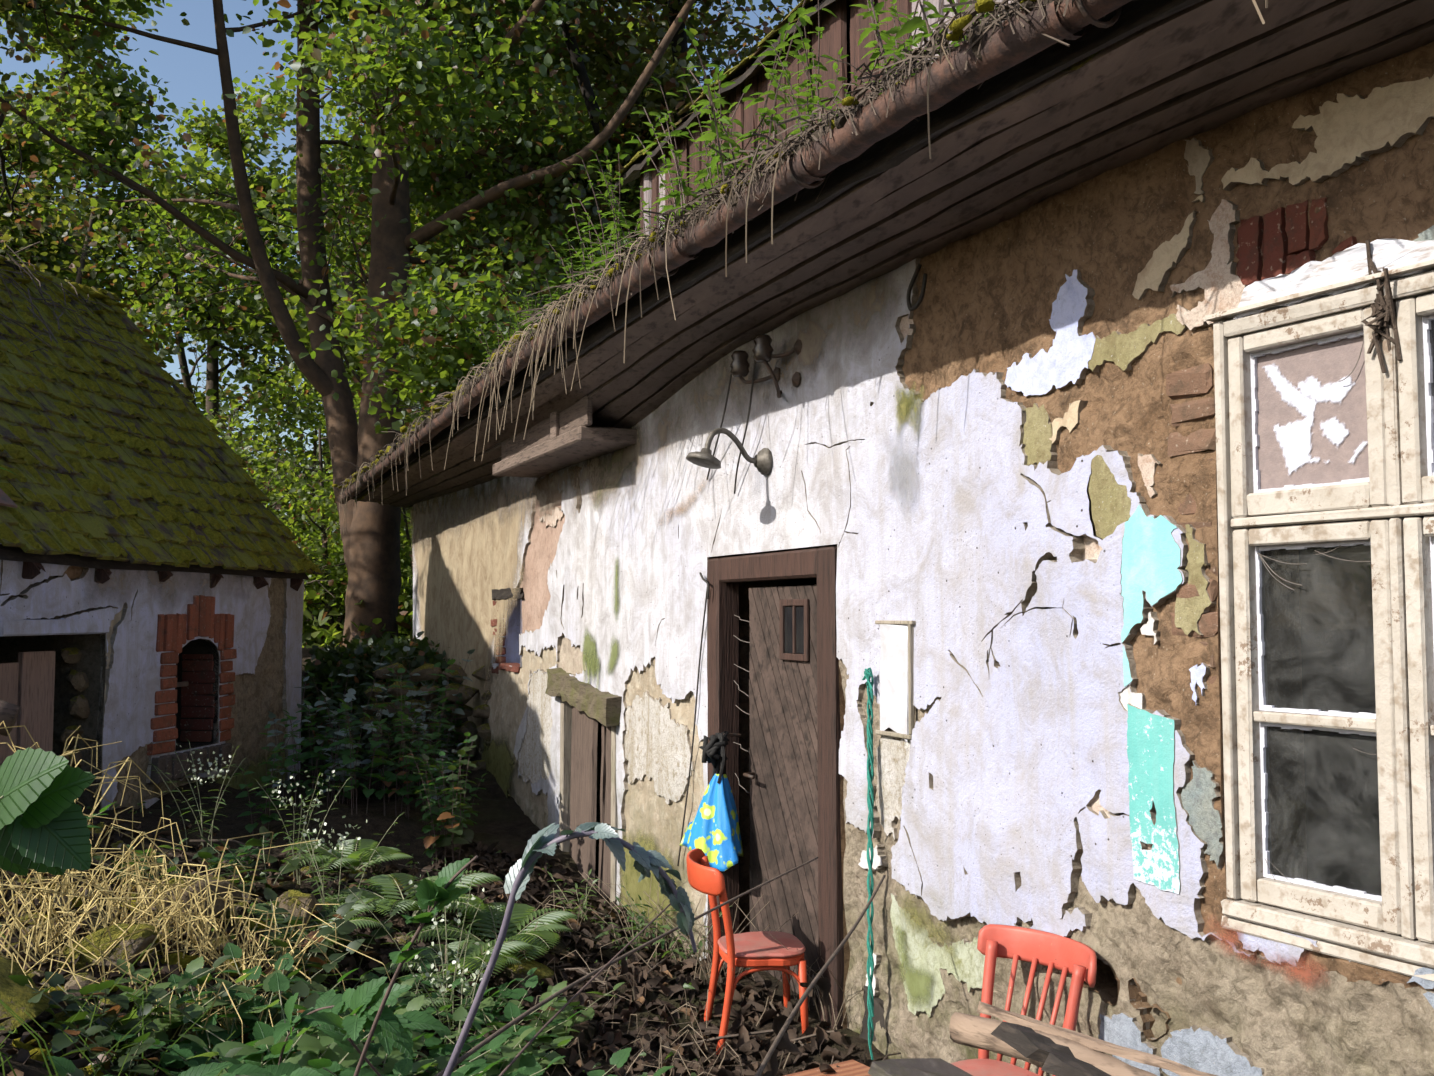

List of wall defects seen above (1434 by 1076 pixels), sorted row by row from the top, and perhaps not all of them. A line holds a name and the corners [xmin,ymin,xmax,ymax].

crack [1,576,113,619]
flaking render [480,475,587,830]
flaking render [624,658,707,956]
flaking render [839,41,1434,1076]